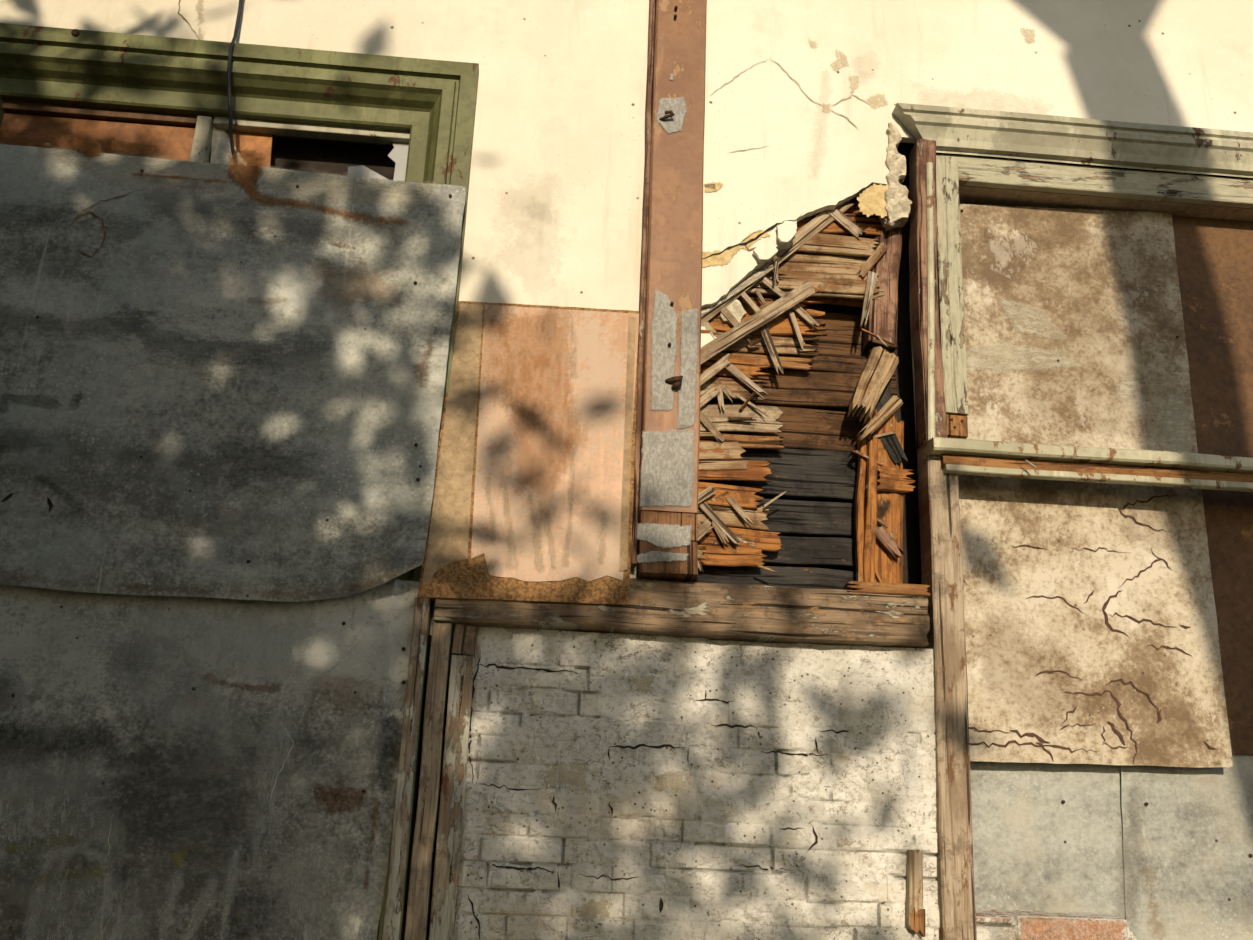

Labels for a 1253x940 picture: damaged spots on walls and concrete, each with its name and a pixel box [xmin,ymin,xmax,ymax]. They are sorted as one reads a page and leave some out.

crack [709,59,870,127]
peeling [868,94,887,109]
corrosion [134,150,407,224]
spalling [694,123,922,590]
crack [1013,495,1192,656]
crack [468,650,578,811]
crack [607,744,689,764]
crack [696,691,849,756]
crack [969,670,1162,765]
crack [738,827,818,871]
crack [492,864,664,913]
flaking render [976,910,1127,940]